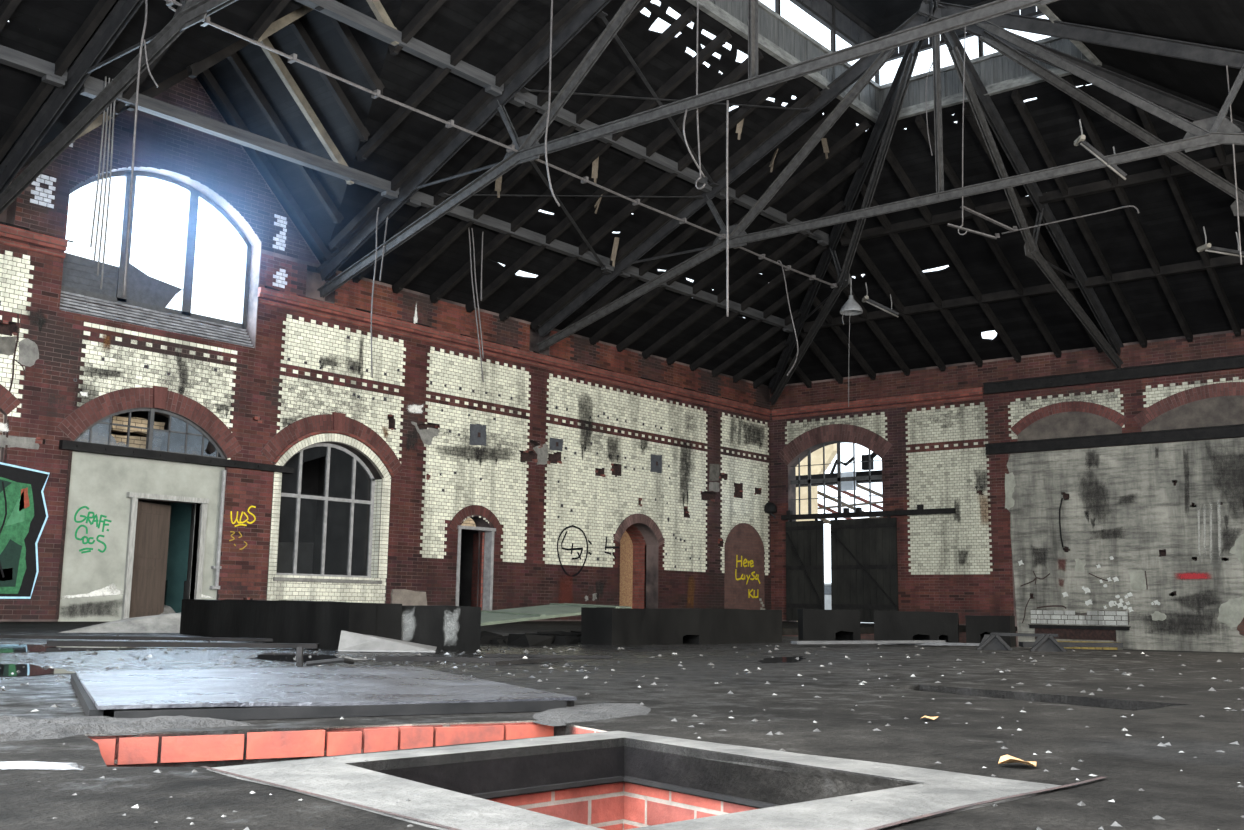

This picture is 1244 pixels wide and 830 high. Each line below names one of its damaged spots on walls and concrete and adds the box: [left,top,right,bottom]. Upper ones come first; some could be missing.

leakage [1197,502,1228,557]
flaking render [1221,533,1244,565]
flaking render [1217,597,1244,636]